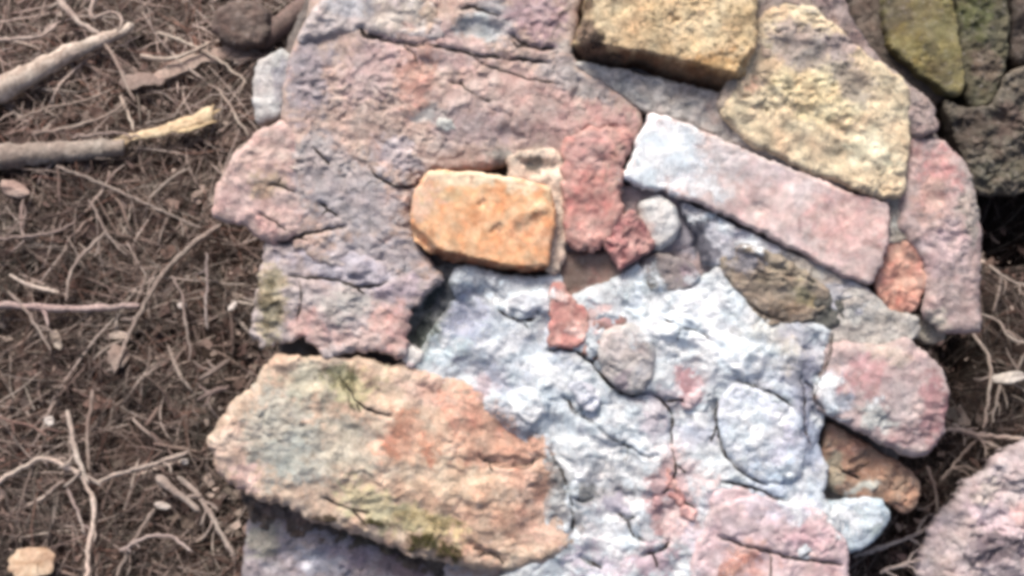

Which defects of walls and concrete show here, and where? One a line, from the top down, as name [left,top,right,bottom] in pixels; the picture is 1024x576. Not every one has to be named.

crack [358,5,564,85]
crack [257,203,341,244]